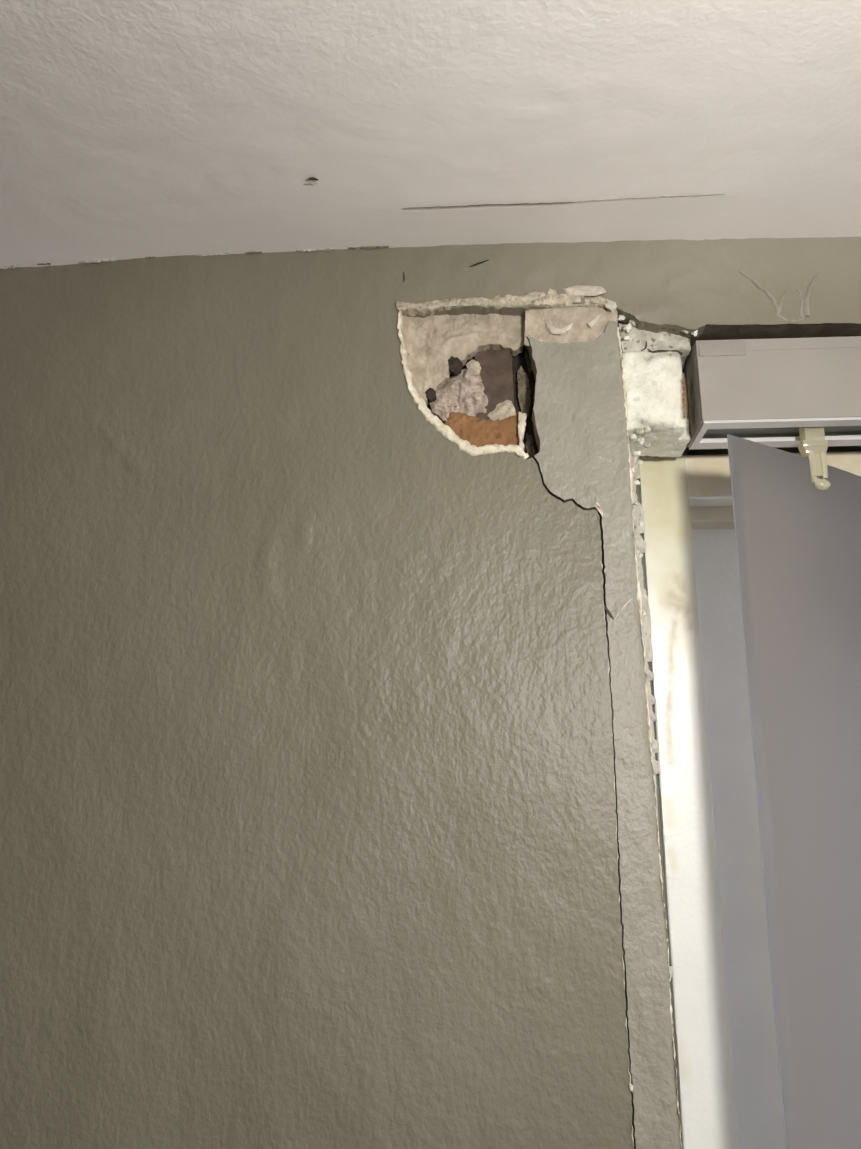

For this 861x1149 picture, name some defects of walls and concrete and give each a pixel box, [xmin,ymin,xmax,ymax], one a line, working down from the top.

flaking render [395,285,682,1148]
crack [534,459,635,1149]